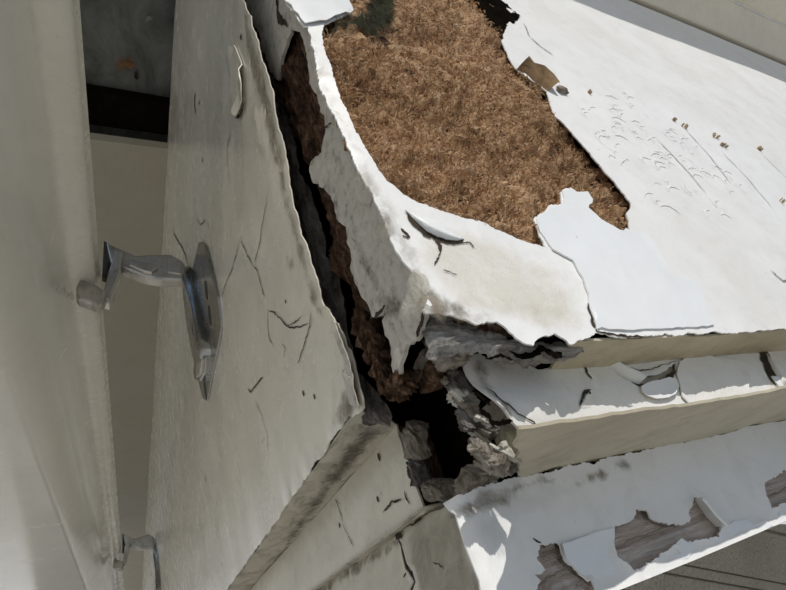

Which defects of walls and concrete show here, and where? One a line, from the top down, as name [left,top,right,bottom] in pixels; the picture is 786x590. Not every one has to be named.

peeling [286,0,714,331]
crack [221,206,311,362]
crack [416,312,424,337]
crack [401,210,474,275]
peeling [421,314,584,369]
peeling [610,356,750,403]
crack [383,491,444,590]
peeling [535,470,786,590]